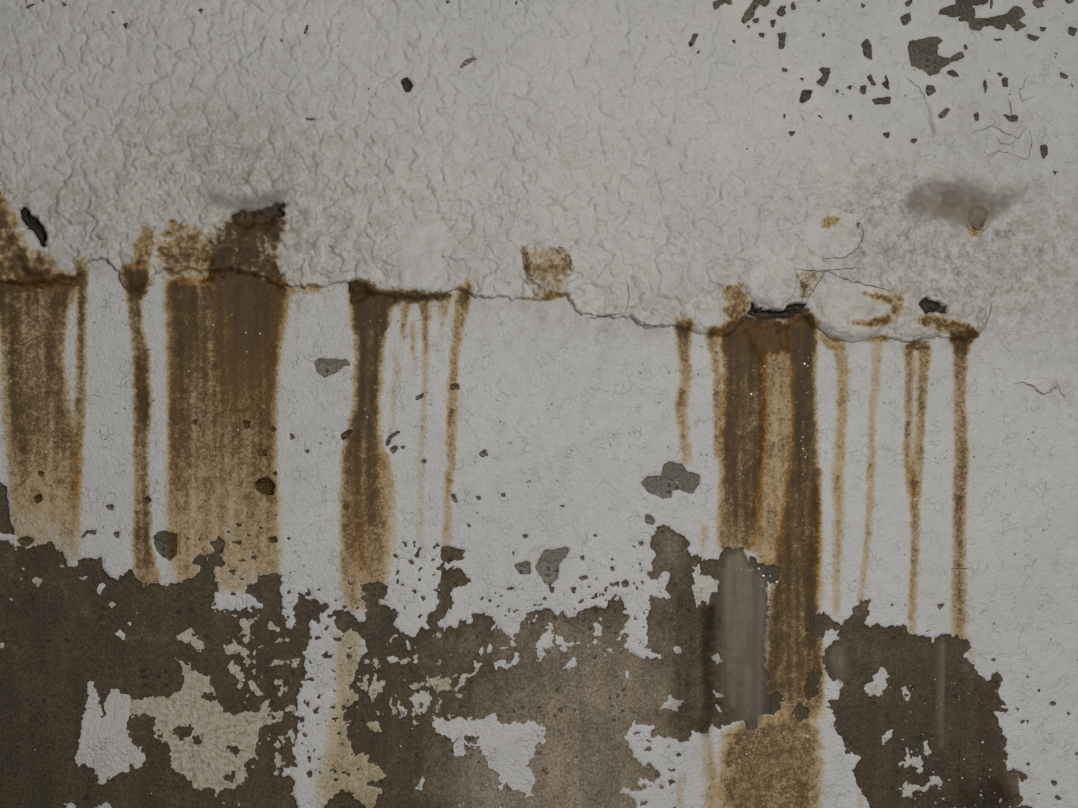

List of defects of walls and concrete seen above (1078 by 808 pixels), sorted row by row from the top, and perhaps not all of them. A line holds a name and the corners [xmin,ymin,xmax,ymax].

peeling [799,67,891,105]
peeling [908,36,967,96]
peeling [939,0,1047,41]
crack [970,79,1032,160]
crack [794,221,890,300]
rust [0,199,87,503]
rust [123,210,287,586]
rust [342,279,471,602]
peeling [641,461,700,504]
rust [708,274,840,808]
peeling [0,483,1032,808]
leakage [705,548,767,721]